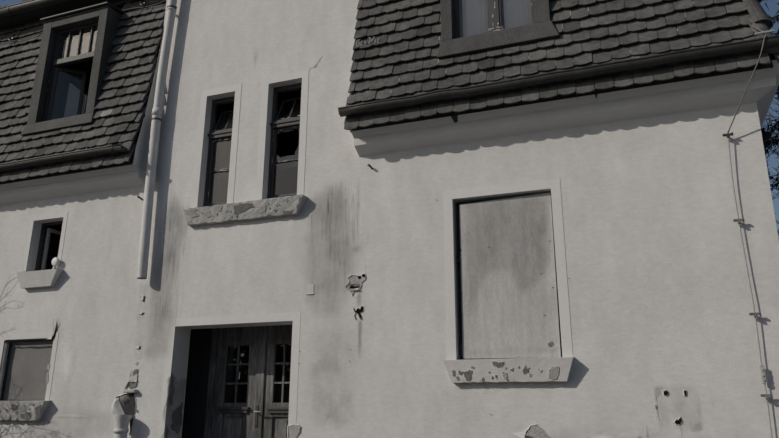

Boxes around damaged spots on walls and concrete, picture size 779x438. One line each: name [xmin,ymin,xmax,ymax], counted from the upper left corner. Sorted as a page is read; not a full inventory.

flaking render [0,317,58,385]
flaking render [111,362,138,435]
flaking render [161,372,186,438]
peeling [452,366,474,381]
peeling [481,361,559,381]
flaking render [512,423,551,438]